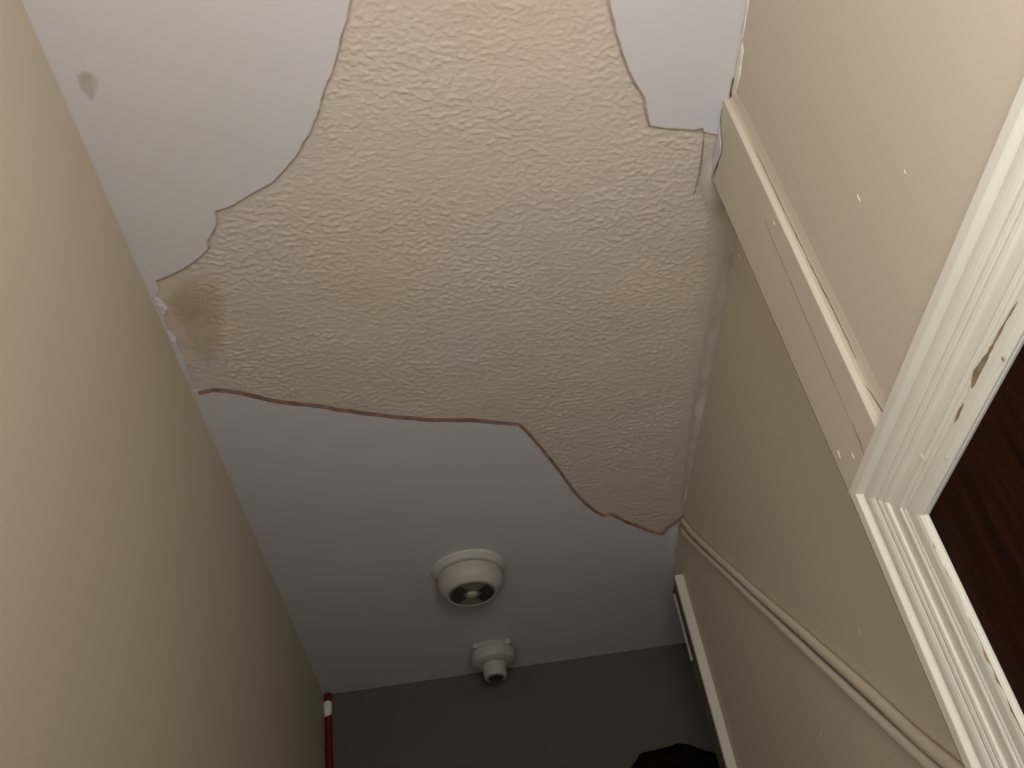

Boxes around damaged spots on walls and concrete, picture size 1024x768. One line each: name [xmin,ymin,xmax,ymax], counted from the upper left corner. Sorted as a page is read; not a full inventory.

peeling [156,0,740,535]
spalling [971,301,1018,388]